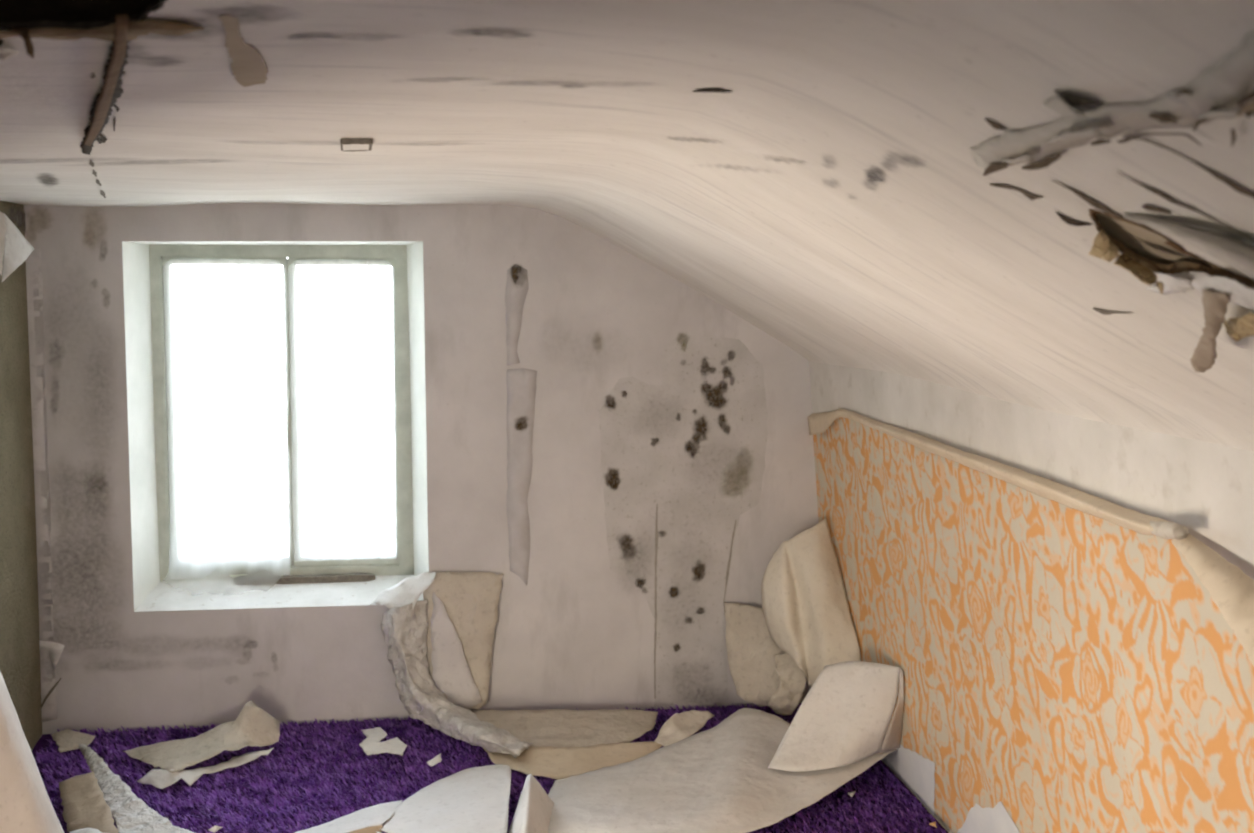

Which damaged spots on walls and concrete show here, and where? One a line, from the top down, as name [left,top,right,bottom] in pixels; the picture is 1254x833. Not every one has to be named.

spalling [0,0,167,30]
peeling [218,14,268,87]
peeling [970,32,1254,176]
spalling [1089,209,1254,288]
peeling [505,264,537,585]
water stain [685,352,734,457]
peeling [0,212,57,722]
water stain [606,469,620,489]
water stain [621,536,632,555]
water stain [693,564,704,580]
peeling [957,801,1020,833]